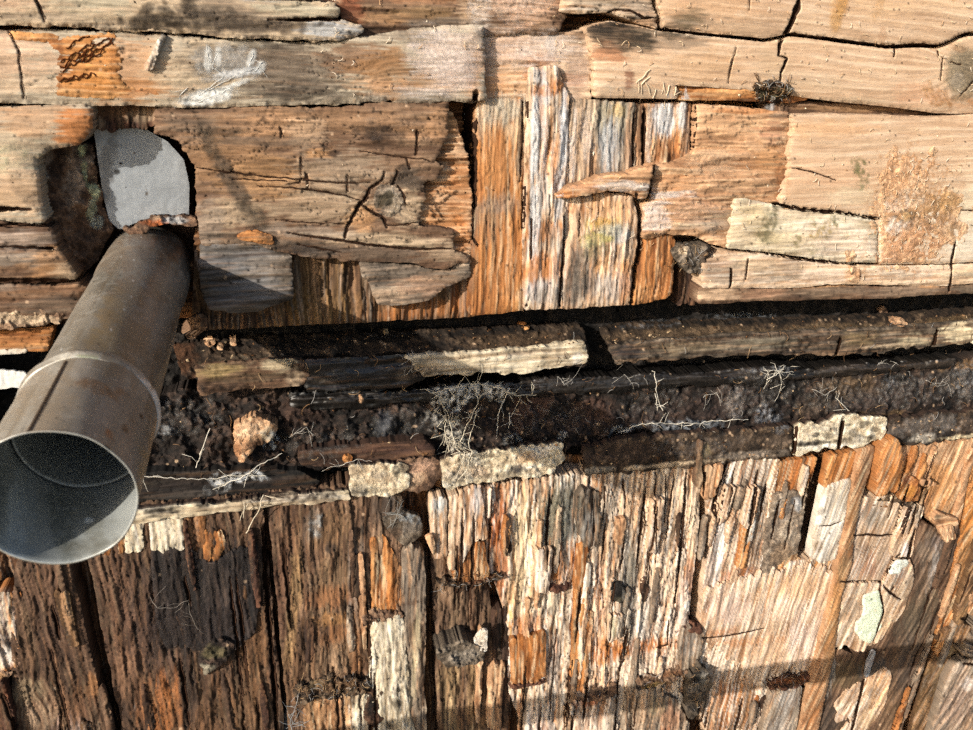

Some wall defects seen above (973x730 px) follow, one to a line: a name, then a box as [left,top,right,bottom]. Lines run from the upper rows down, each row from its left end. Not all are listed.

crack [604,0,973,96]
crack [196,131,451,252]
crack [462,93,478,245]
crack [629,108,655,303]
crack [230,527,292,730]
crack [333,609,378,730]
peeling [854,590,883,643]
peeling [888,559,908,574]